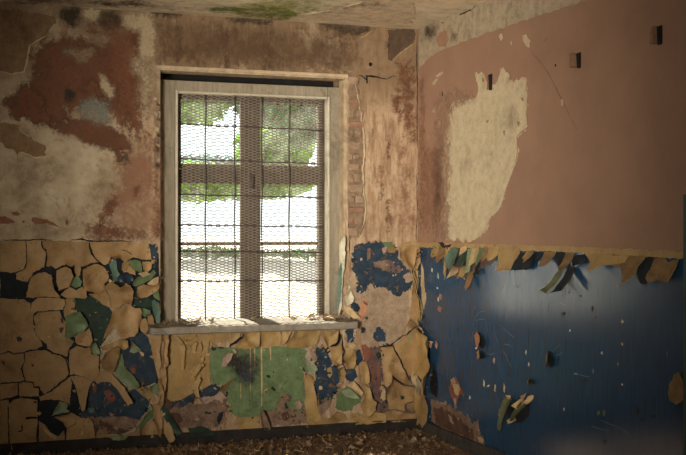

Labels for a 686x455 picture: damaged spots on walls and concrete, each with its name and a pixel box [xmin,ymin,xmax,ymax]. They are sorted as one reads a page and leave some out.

water stain [160,0,350,71]
flaking render [387,0,585,69]
flaking render [79,74,115,125]
flaking render [122,11,161,171]
crack [359,75,396,83]
crack [522,34,578,130]
flaking render [0,122,46,159]
crack [6,238,132,291]
peeling [205,67,683,431]
peeling [0,240,233,444]
crack [379,326,418,386]
crack [2,344,70,440]